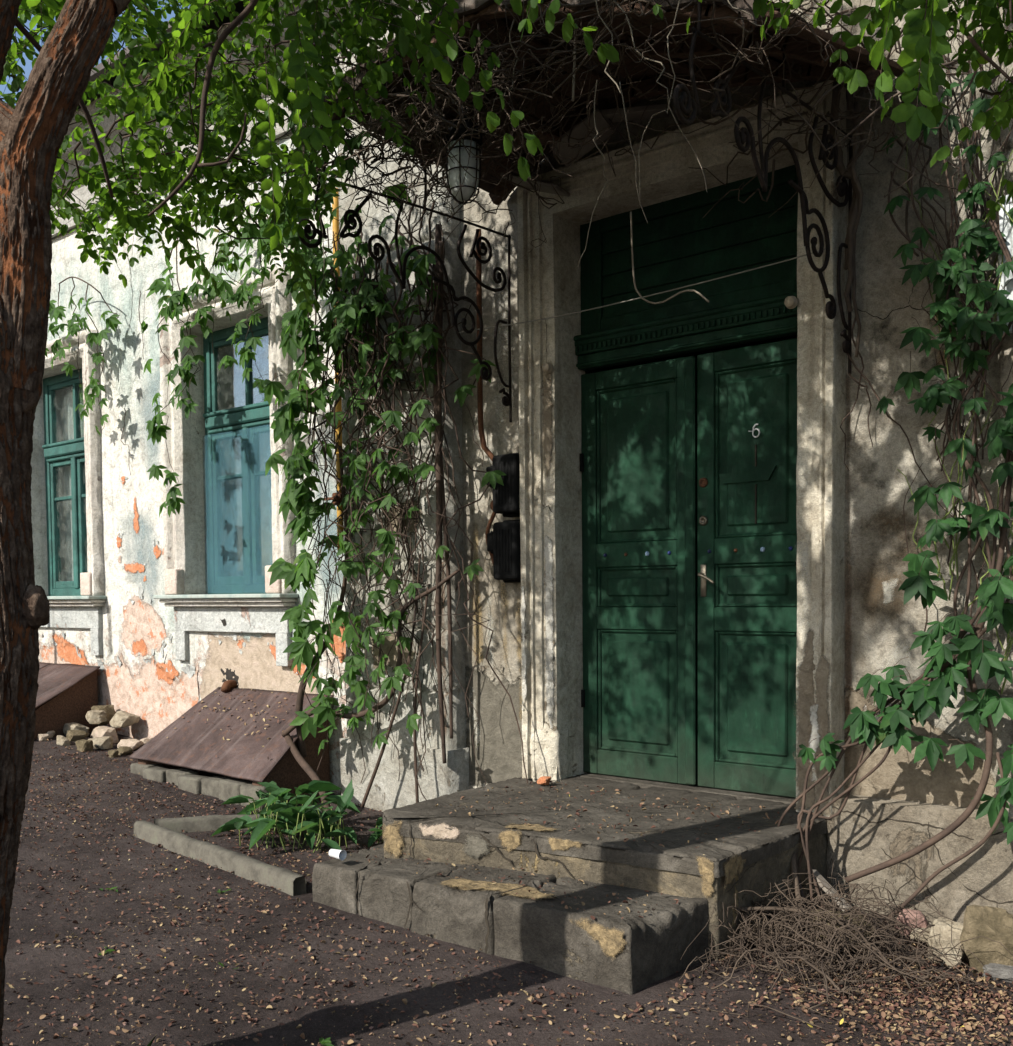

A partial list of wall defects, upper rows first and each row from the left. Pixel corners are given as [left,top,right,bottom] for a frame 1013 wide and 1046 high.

flaking render [39,497,318,740]
spalling [697,854,746,897]
crack [832,806,1013,908]
spalling [570,918,626,956]